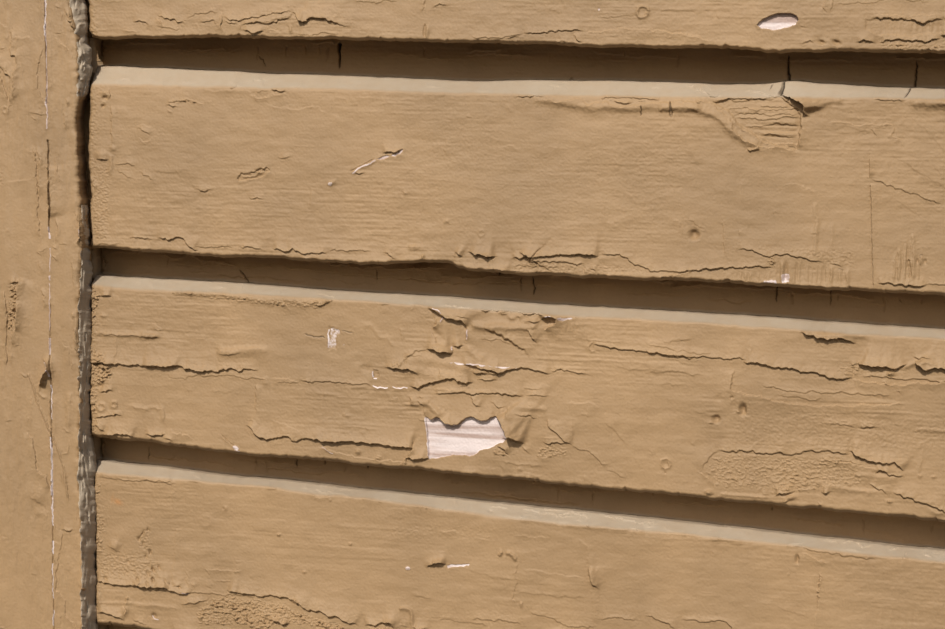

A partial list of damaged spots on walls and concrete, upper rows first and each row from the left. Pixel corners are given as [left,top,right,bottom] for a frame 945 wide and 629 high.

peeling [755,11,844,48]
peeling [856,10,945,50]
peeling [513,79,826,156]
crack [870,60,921,98]
crack [866,151,945,289]
crack [34,0,80,629]
peeling [128,231,858,382]
peeling [721,323,945,432]
peeling [696,441,945,517]
crack [97,580,226,629]
peeling [96,513,400,629]
crack [436,602,740,629]